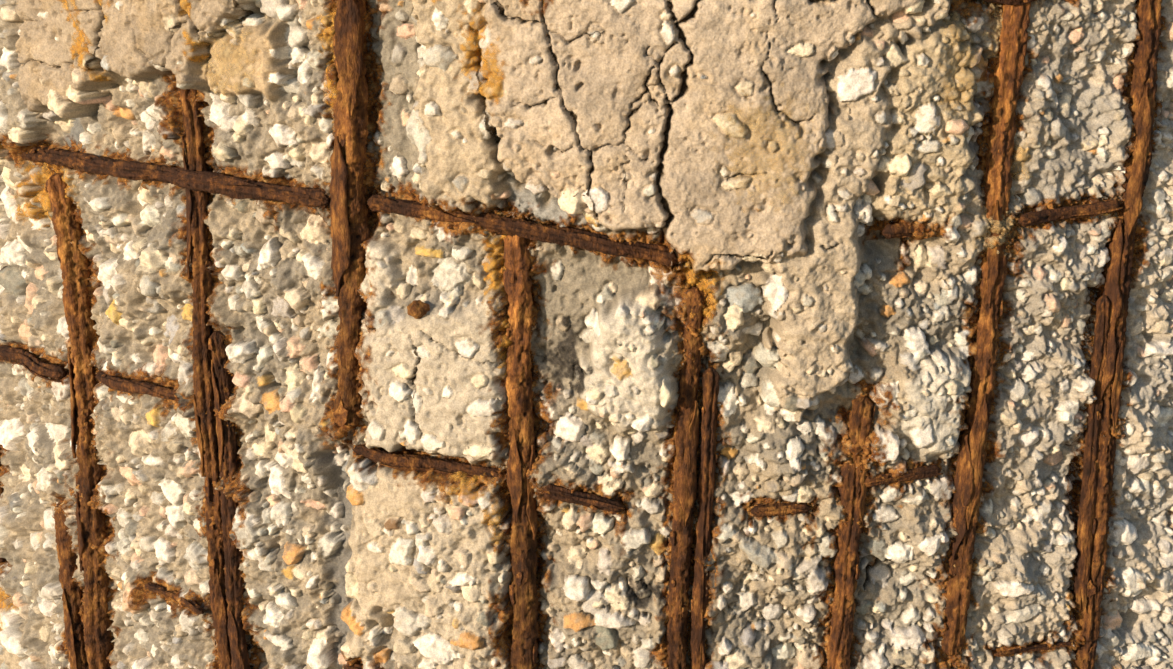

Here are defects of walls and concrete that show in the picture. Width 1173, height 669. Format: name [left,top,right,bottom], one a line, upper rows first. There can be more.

crack [20,10,105,70]
crack [169,0,254,59]
crack [470,28,501,144]
crack [494,0,700,238]
crack [761,52,810,124]
corrosion [1151,97,1163,152]
corrosion [1158,7,1168,62]
corrosion [0,0,339,669]
spalling [0,0,666,669]
corrosion [319,0,731,669]
spalling [528,0,1173,669]
corrosion [740,0,1150,669]